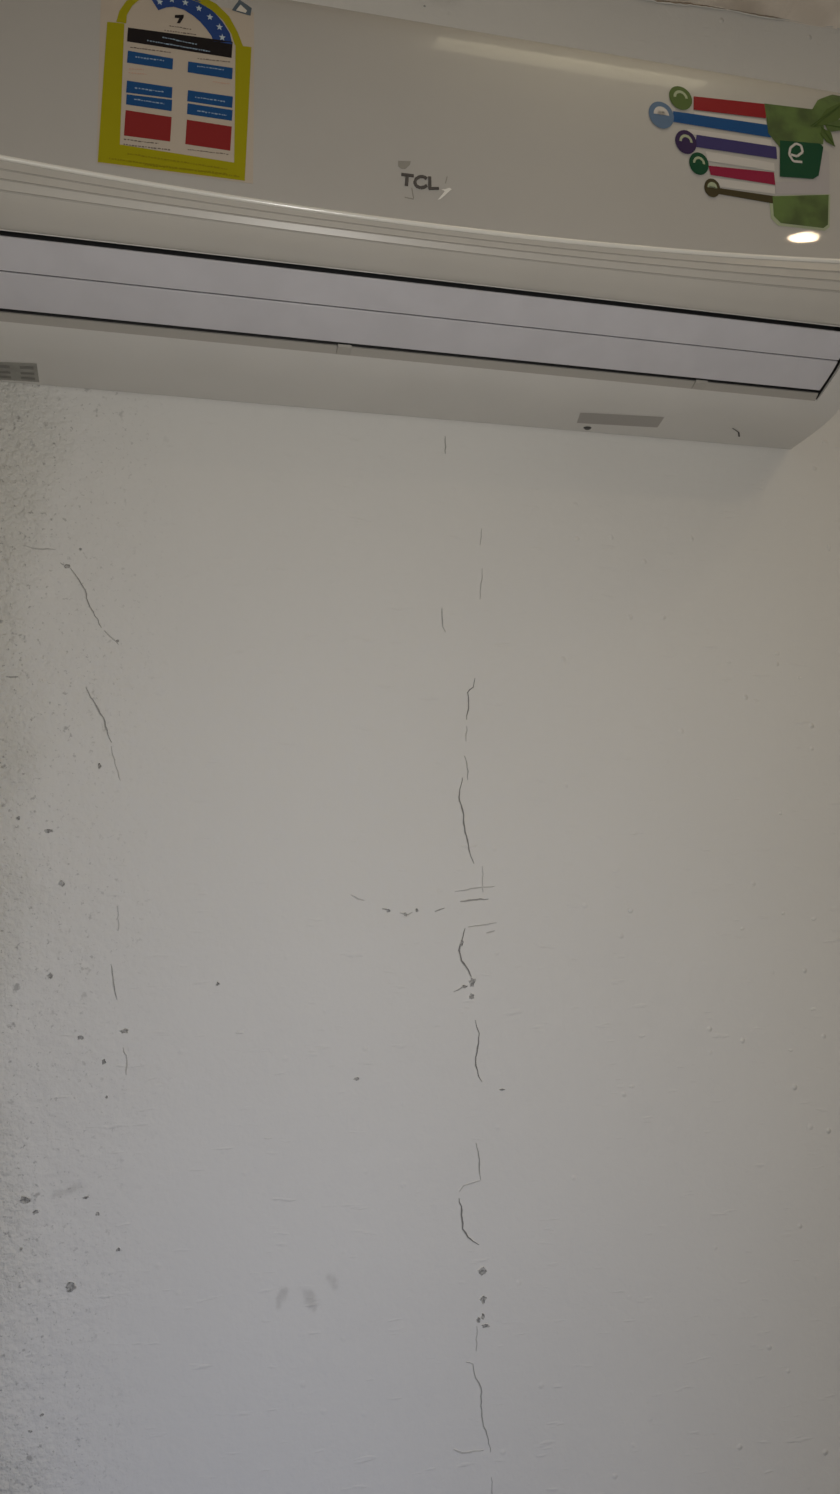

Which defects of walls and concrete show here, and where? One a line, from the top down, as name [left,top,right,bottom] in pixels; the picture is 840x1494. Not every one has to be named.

crack [86,687,121,781]
crack [351,678,497,1082]
crack [453,1143,493,1494]